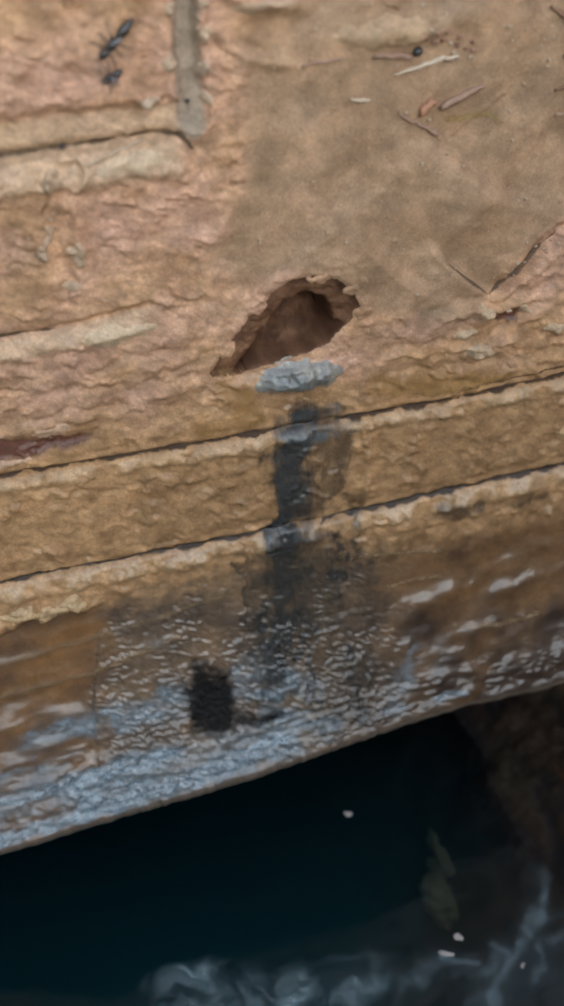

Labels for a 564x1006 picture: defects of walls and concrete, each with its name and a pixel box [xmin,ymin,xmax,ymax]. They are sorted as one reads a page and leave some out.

spalling [209,274,365,378]
damp [256,401,439,707]
damp [0,660,294,850]